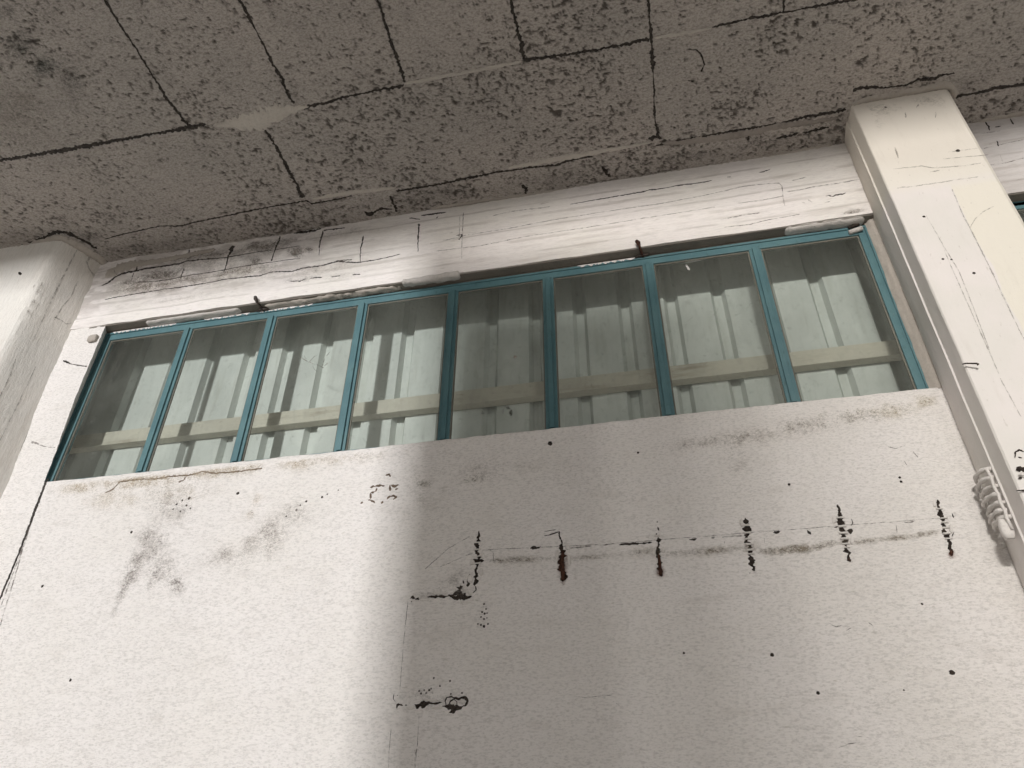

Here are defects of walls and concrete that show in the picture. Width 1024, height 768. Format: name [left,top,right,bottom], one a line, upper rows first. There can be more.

crack [688,49,705,82]
crack [853,72,1024,108]
crack [776,126,829,139]
crack [21,230,97,249]
crack [101,166,854,300]
crack [425,520,914,569]